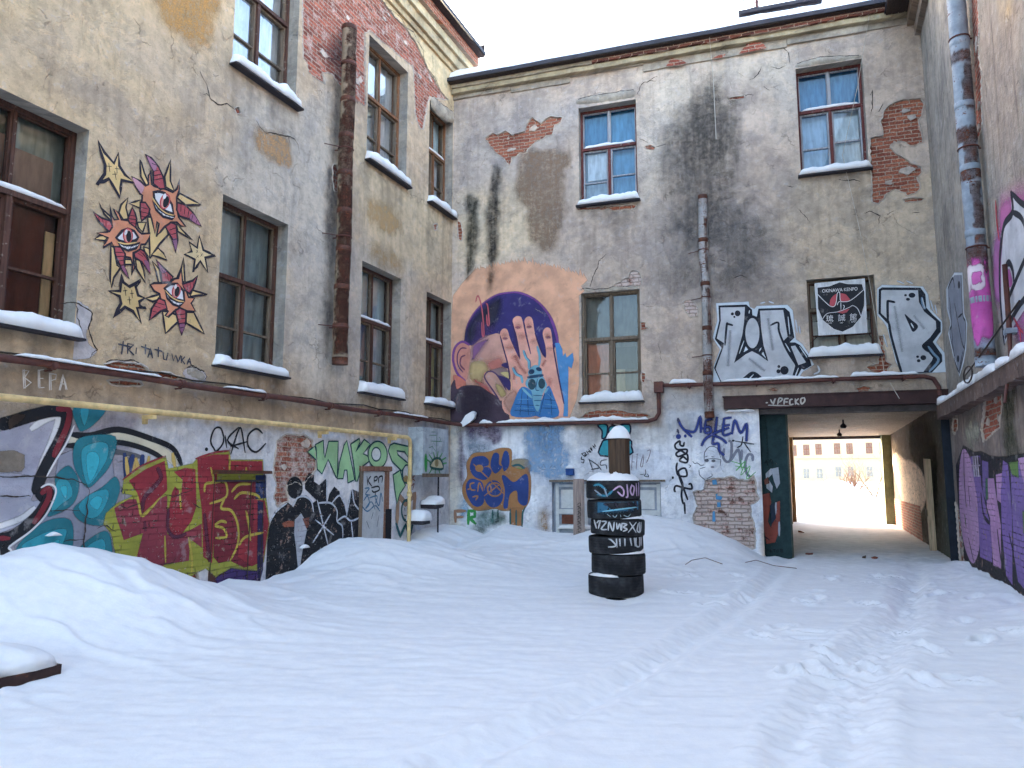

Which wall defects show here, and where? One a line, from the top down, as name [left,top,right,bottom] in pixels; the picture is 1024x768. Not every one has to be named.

crack [200,72,235,110]
rust [333,27,357,354]
flaking render [301,0,449,130]
leakage [466,170,500,274]
flaking render [484,115,563,166]
leakage [516,150,570,250]
rust [700,198,711,344]
leakage [667,90,761,284]
flaking render [869,98,925,204]
rust [951,49,974,109]
rust [956,125,989,272]
flaking render [693,475,760,550]